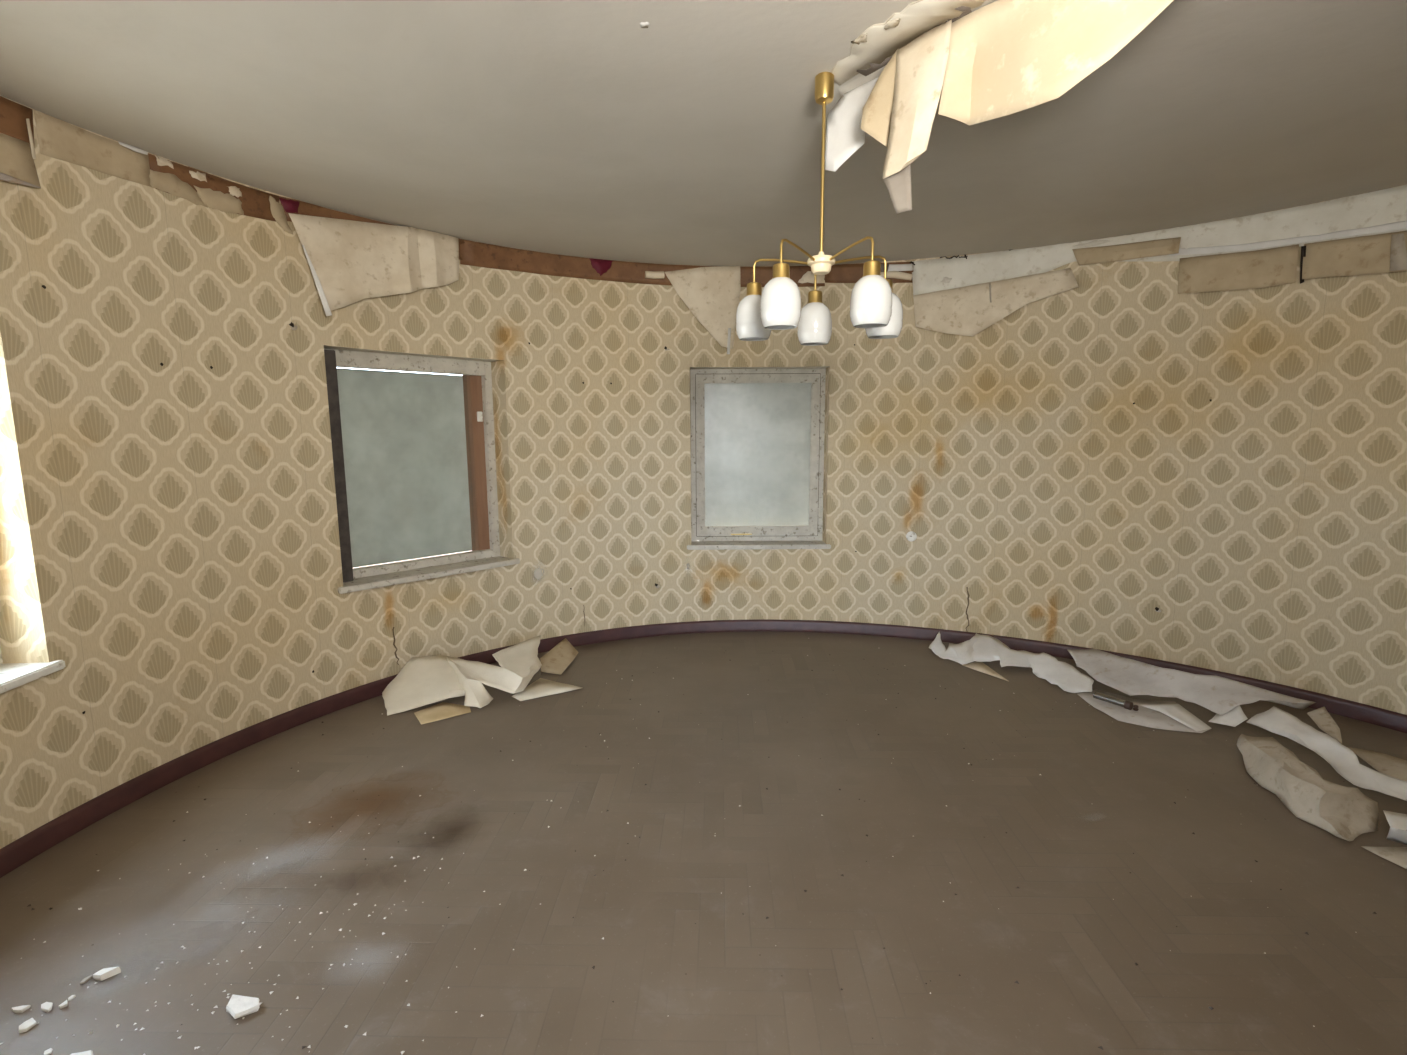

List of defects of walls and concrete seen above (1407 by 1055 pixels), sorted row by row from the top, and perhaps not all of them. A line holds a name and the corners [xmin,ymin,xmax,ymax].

peeling [0,96,152,188]
peeling [279,196,465,316]
peeling [645,266,741,354]
flaking render [912,185,1407,337]